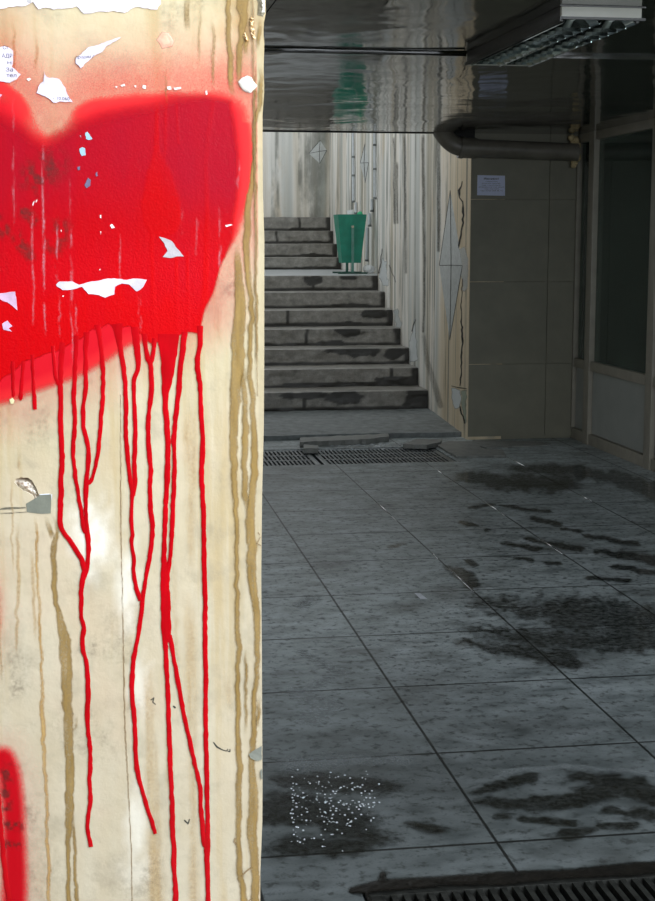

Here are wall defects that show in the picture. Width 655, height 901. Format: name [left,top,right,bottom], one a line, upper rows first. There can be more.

damp [226,0,261,85]
damp [393,139,406,262]
crack [457,183,465,248]
crack [452,279,466,424]
damp [229,77,402,901]
damp [456,463,655,499]
damp [445,559,479,589]
damp [472,504,655,582]
damp [463,595,655,669]
damp [407,822,448,833]
damp [473,766,655,841]